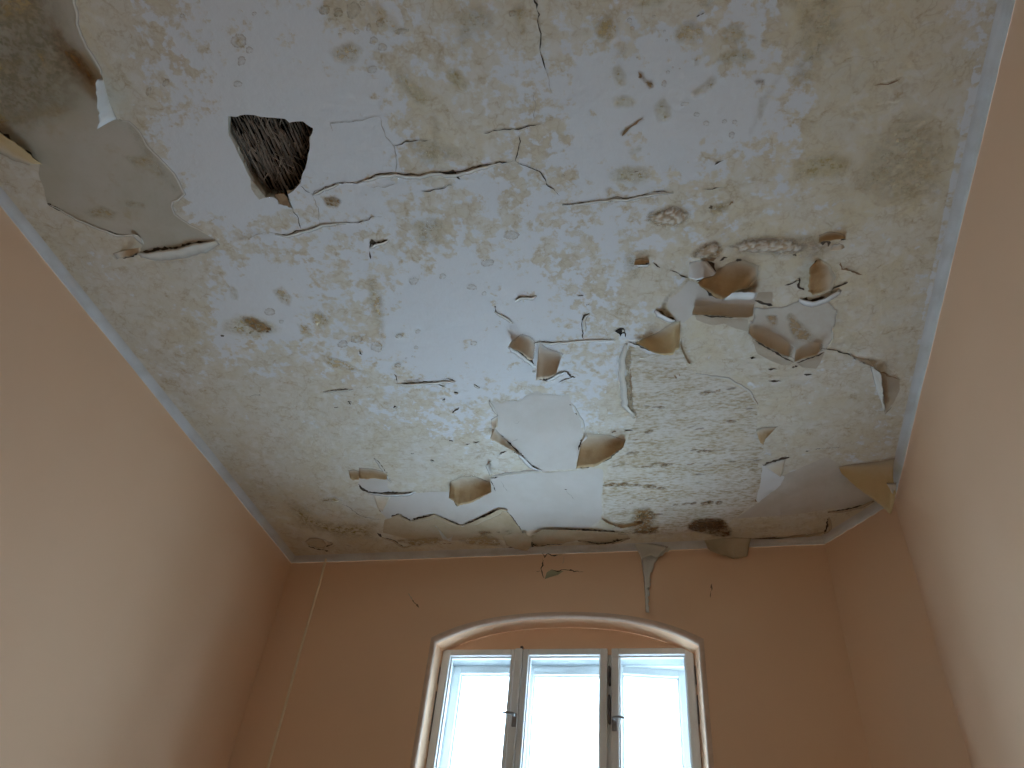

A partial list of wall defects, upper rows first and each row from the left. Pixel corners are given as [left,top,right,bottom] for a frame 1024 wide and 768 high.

peeling [0,0,219,260]
flaking render [228,115,313,209]
crack [248,0,674,239]
peeling [634,258,660,268]
peeling [667,261,758,323]
peeling [358,330,874,559]
leakage [623,503,658,534]
leakage [688,518,731,537]